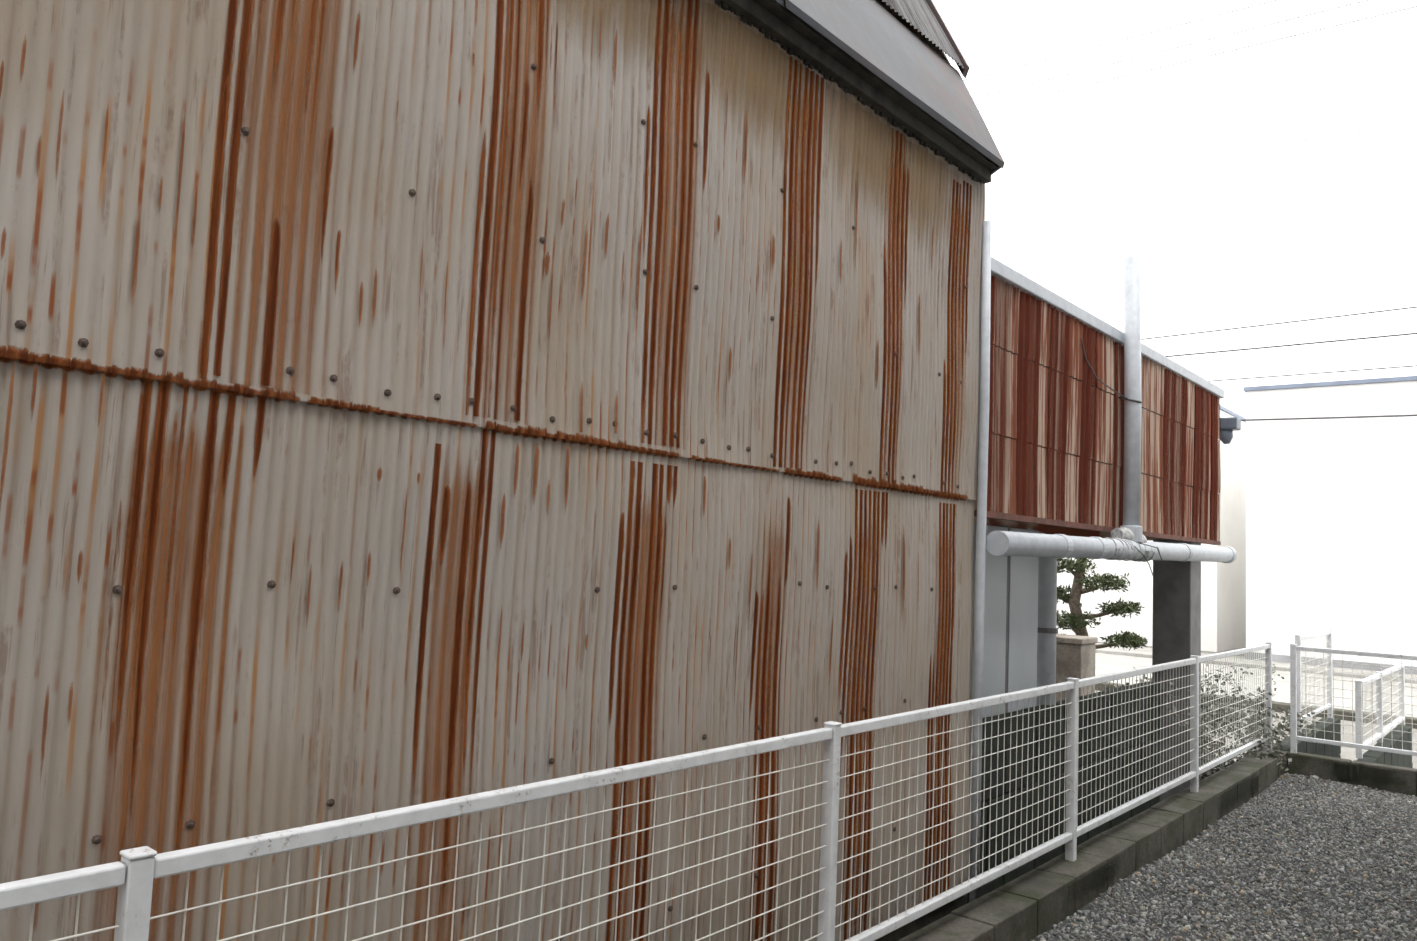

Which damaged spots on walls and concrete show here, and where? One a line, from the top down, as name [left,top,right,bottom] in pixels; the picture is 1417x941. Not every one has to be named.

rust [0,0,972,941]
rust [987,276,995,511]
rust [1016,291,1097,524]
rust [1112,342,1125,528]
rust [1163,369,1221,541]